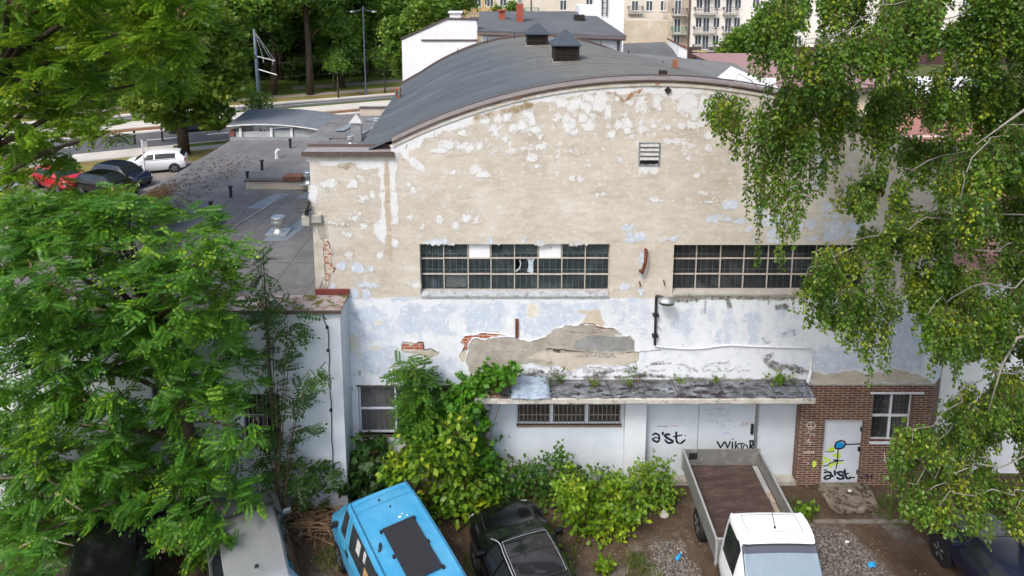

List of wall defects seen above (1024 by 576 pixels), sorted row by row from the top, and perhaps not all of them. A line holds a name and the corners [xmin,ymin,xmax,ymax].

flaking render [307,84,864,391]